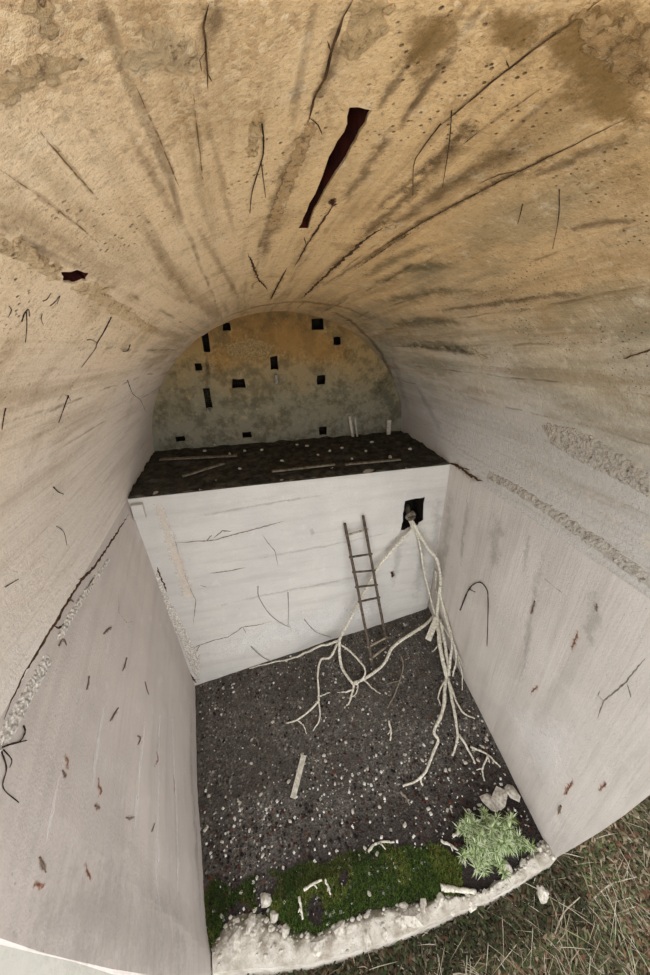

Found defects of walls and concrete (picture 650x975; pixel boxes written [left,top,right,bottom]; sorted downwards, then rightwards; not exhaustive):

crack [308,0,353,134]
water stain [406,17,455,75]
water stain [493,11,536,50]
crack [444,0,601,123]
water stain [551,19,638,120]
crack [301,119,626,299]
spalling [0,234,158,335]
crack [4,514,129,719]
crack [157,521,283,651]
crack [449,463,482,481]
spalling [486,471,650,589]
spalling [541,423,650,498]